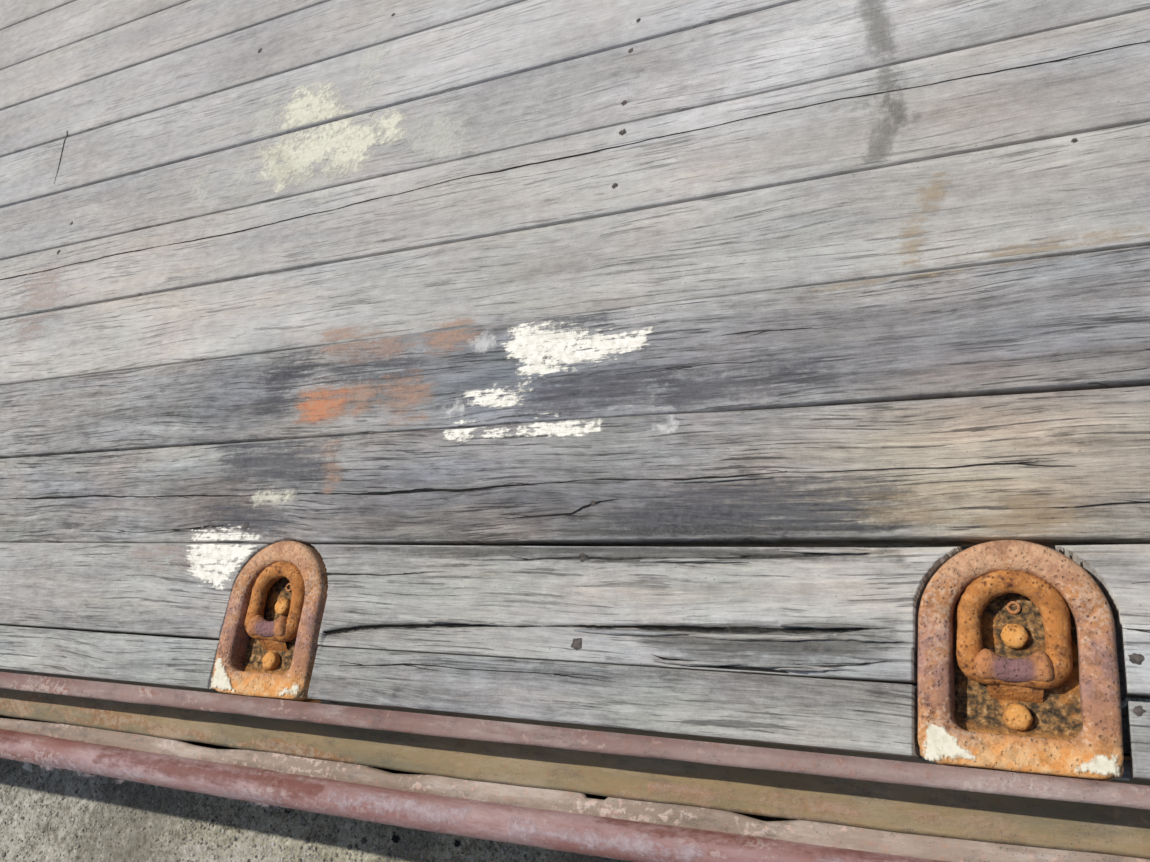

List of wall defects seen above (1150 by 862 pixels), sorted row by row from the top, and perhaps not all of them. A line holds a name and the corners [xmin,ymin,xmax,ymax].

rust [297,385,371,422]
crack [818,460,1064,472]
crack [0,469,787,519]
crack [116,525,222,535]
crack [472,548,882,563]
crack [324,619,899,673]
crack [339,661,610,681]